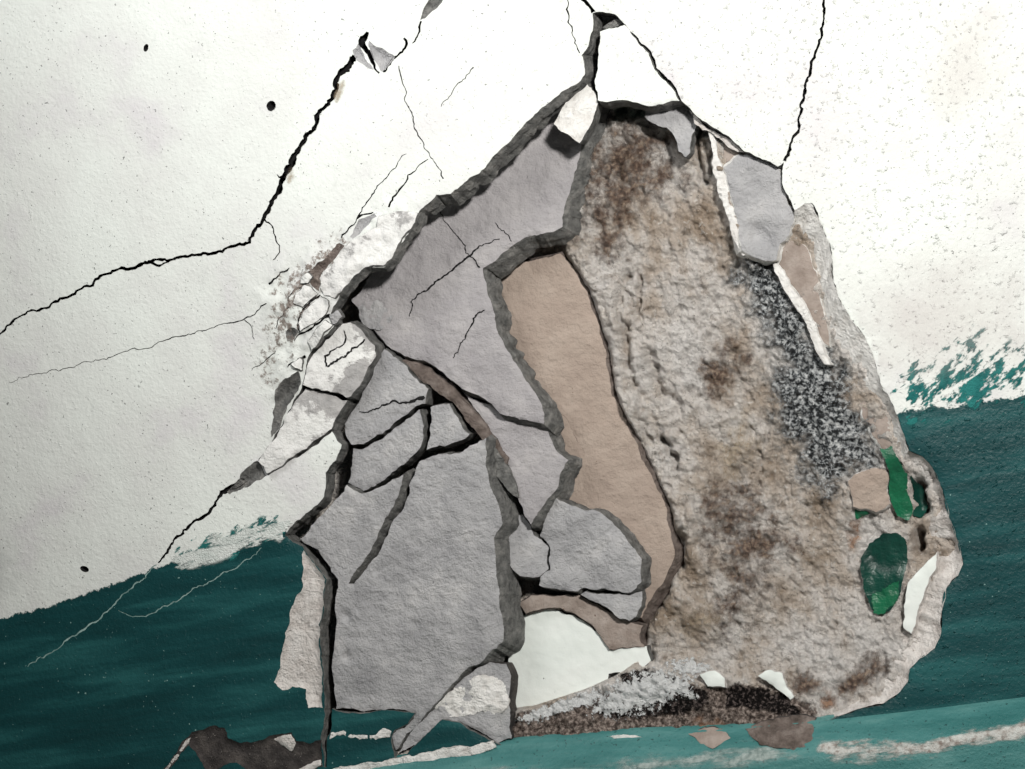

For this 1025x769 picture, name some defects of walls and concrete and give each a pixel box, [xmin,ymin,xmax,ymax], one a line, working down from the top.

spalling [353,41,395,72]
crack [566,0,595,53]
spalling [592,16,615,68]
crack [783,0,826,161]
crack [0,21,444,383]
spalling [308,213,377,291]
spalling [286,328,298,341]
spalling [341,273,371,323]
spalling [271,371,301,437]
spalling [396,359,509,478]
spalling [500,107,1025,769]
peeling [172,402,368,708]